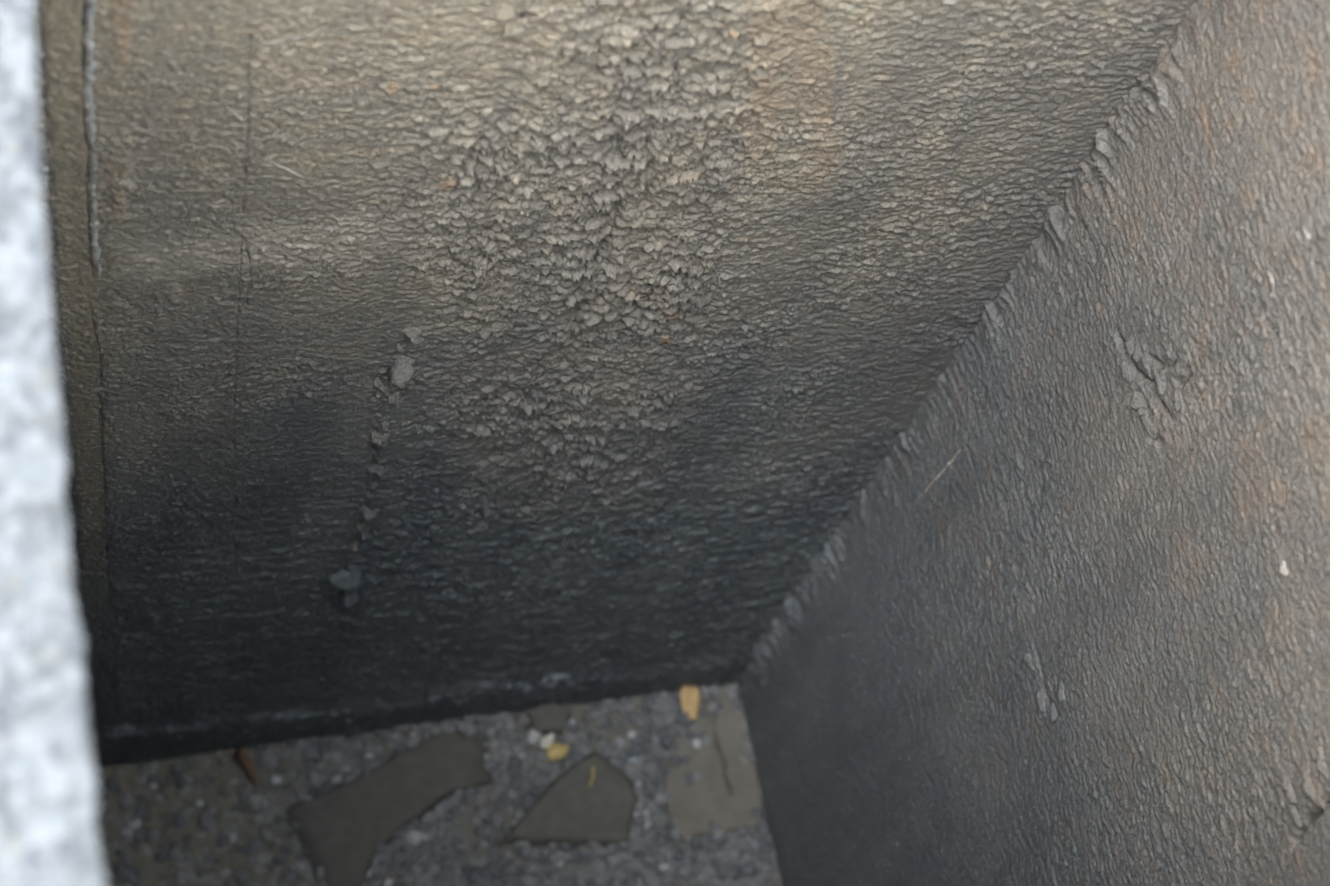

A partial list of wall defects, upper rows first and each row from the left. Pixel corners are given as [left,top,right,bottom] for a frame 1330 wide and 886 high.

crack [232,21,252,573]